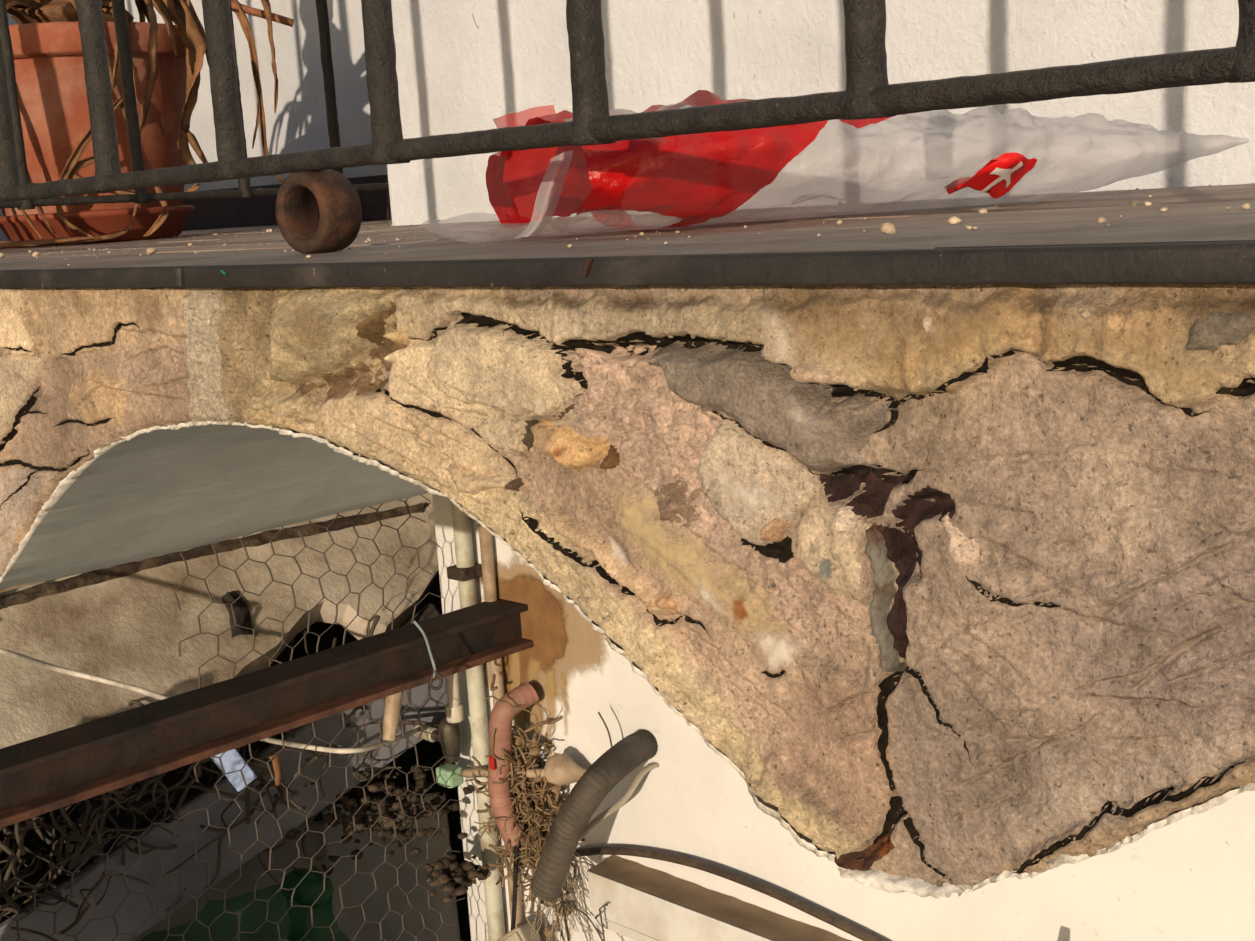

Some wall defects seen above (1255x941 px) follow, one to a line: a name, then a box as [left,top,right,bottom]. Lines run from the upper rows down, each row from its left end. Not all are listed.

crack [3,322,144,356]
spalling [249,322,411,419]
crack [411,312,1255,433]
flaking render [922,317,935,336]
crack [0,386,114,510]
spalling [427,323,956,672]
crack [521,512,710,636]
peeling [840,869,973,899]
crack [856,634,973,892]
peeling [1046,854,1085,869]
crack [1007,761,1245,878]
peeling [1240,783,1255,792]